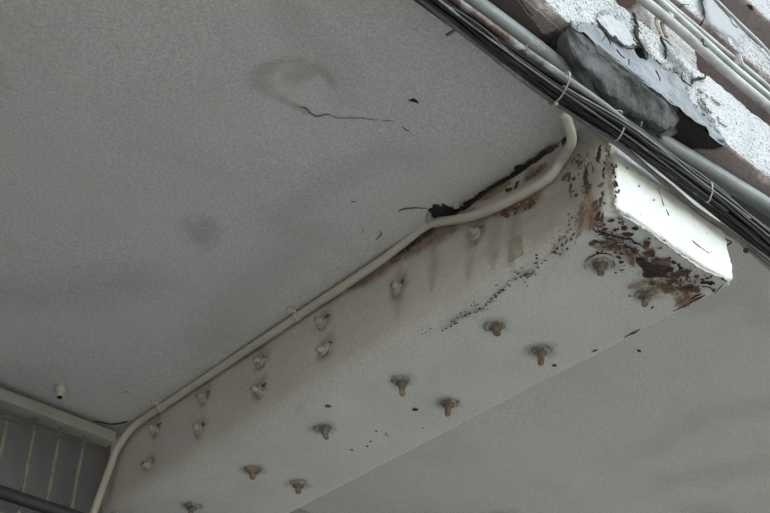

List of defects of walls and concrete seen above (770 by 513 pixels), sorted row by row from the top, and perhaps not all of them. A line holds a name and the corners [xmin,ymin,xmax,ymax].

peeling [704,0,745,47]
spalling [488,0,727,148]
crack [299,106,409,132]
rust [442,145,623,332]
rust [628,238,715,312]